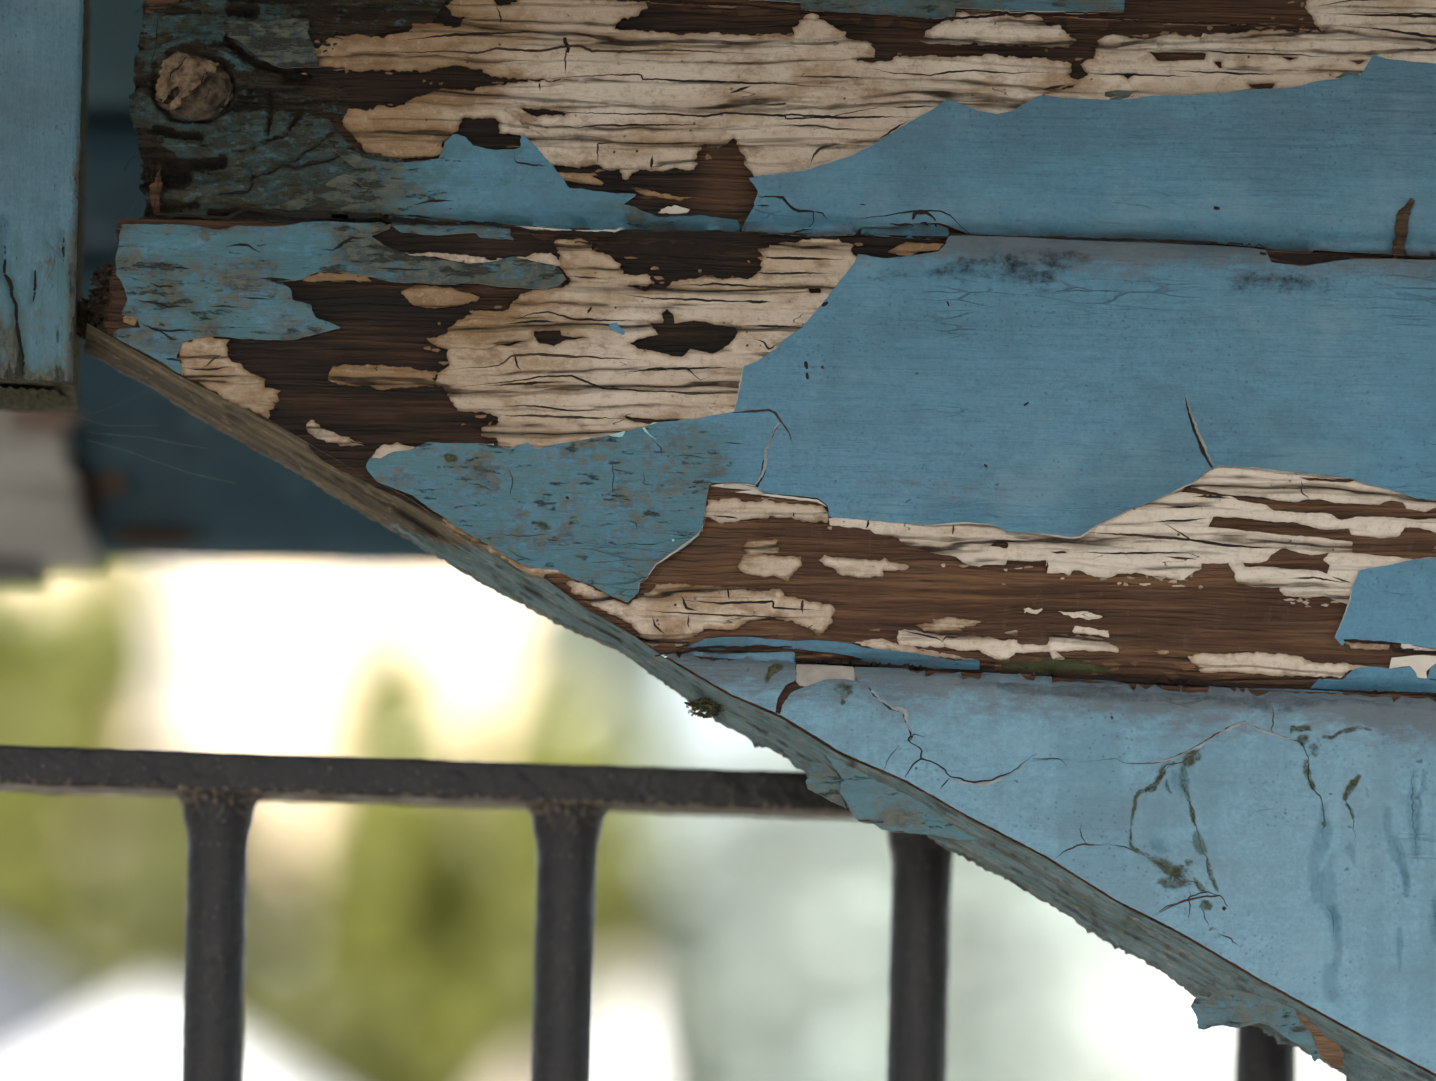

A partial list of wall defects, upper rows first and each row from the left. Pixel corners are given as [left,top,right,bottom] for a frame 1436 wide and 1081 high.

peeling [178,0,1436,693]
crack [1185,396,1215,470]
crack [655,639,1436,944]